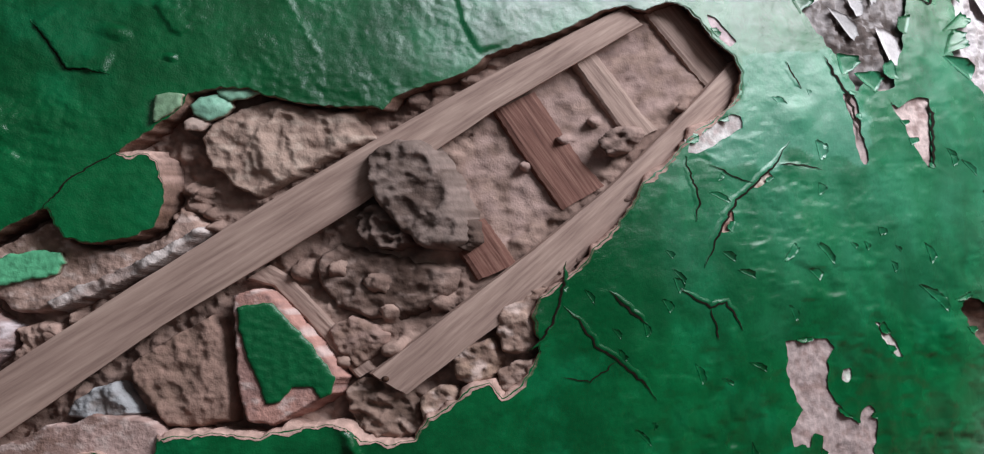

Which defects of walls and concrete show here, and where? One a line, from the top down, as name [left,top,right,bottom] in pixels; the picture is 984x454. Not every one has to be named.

peeling [792,0,910,165]
peeling [942,0,984,93]
spalling [0,1,744,454]
peeling [722,251,756,278]
crack [683,141,821,268]
peeling [891,97,935,168]
peeling [946,148,977,176]
crack [528,262,657,400]
crack [682,289,743,338]
peeling [875,321,903,357]
spalling [919,284,984,345]
peeling [785,337,878,454]